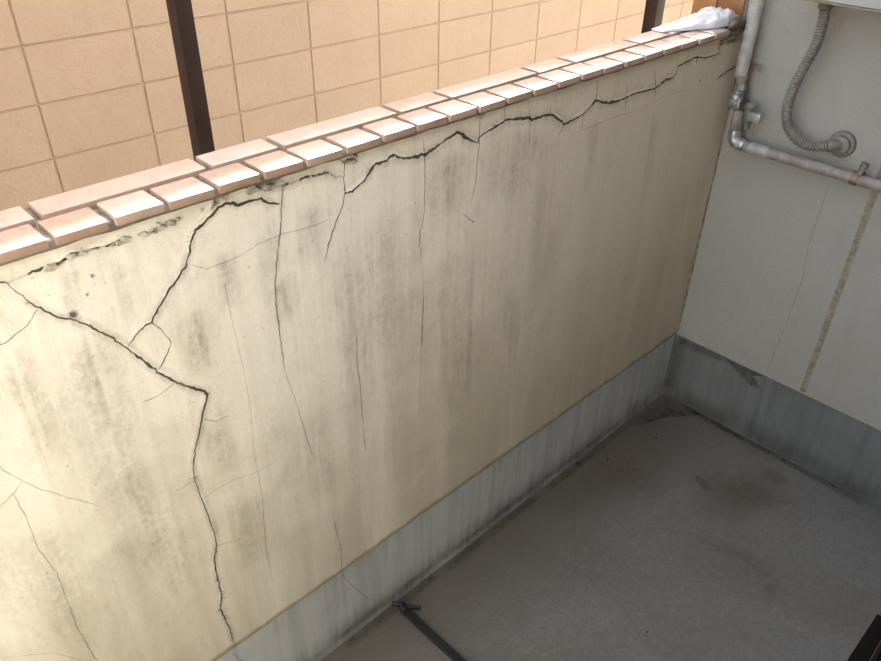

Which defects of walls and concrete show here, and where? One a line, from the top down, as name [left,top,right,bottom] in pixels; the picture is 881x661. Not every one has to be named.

crack [0,36,736,660]